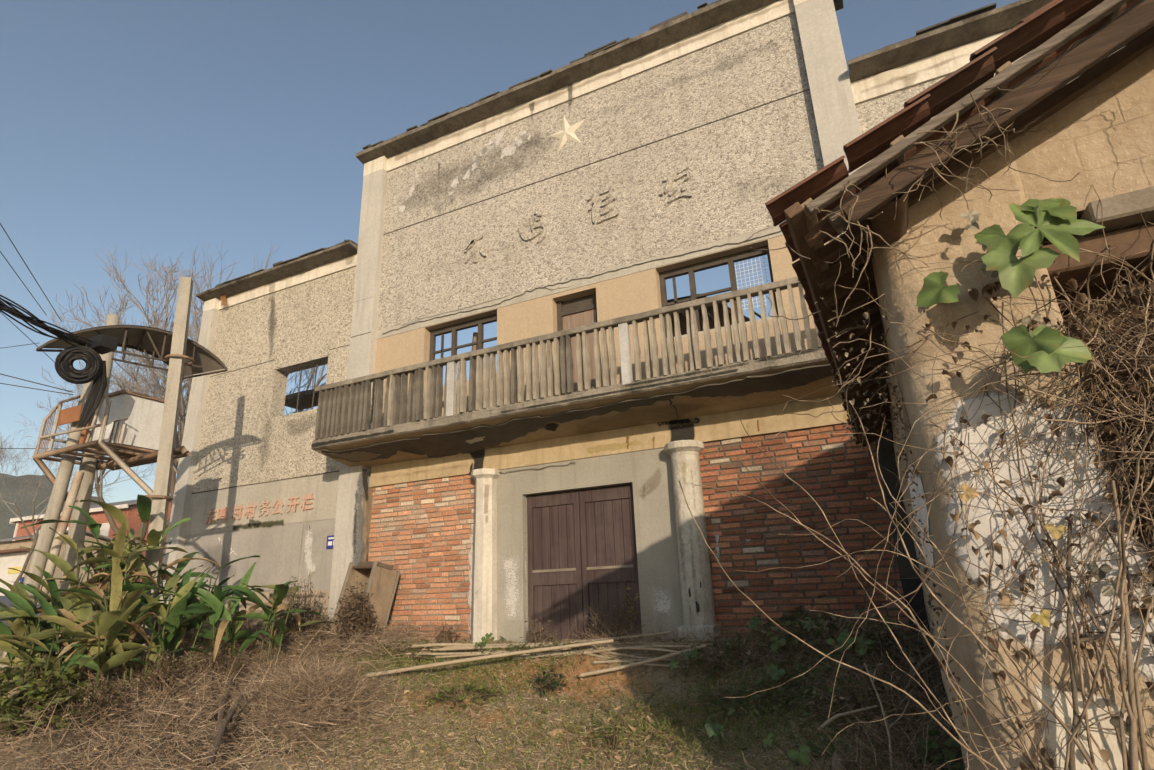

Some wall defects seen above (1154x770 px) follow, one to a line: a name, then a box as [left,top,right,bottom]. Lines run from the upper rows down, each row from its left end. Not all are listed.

peeling [315,363,834,462]
peeling [907,459,934,575]
peeling [936,392,1154,683]
peeling [1034,685,1149,770]